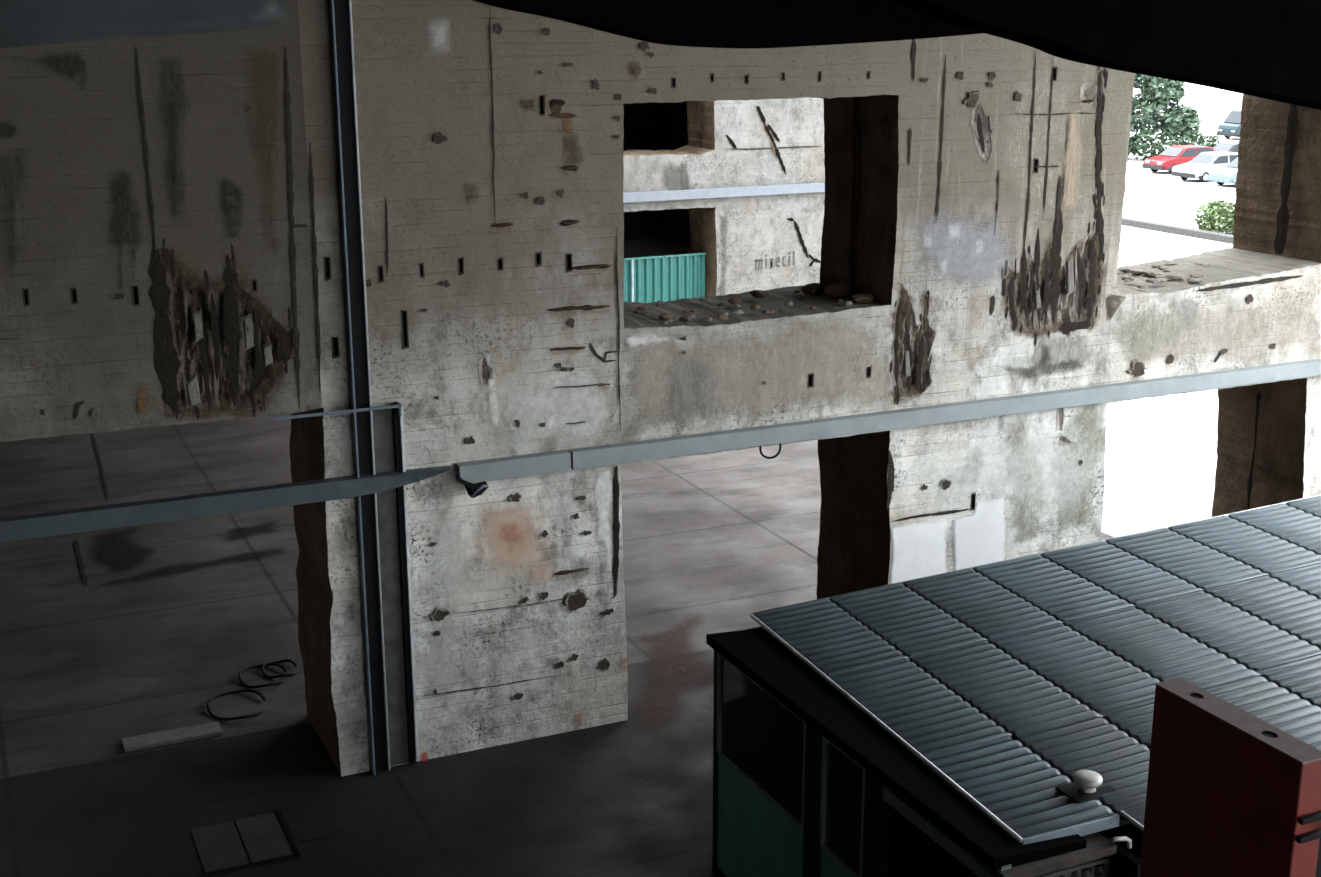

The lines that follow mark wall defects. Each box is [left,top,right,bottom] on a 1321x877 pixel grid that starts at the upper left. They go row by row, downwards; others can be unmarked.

damp [112,174,139,278]
spalling [924,67,1126,346]
spalling [148,238,294,420]
spalling [890,283,937,405]